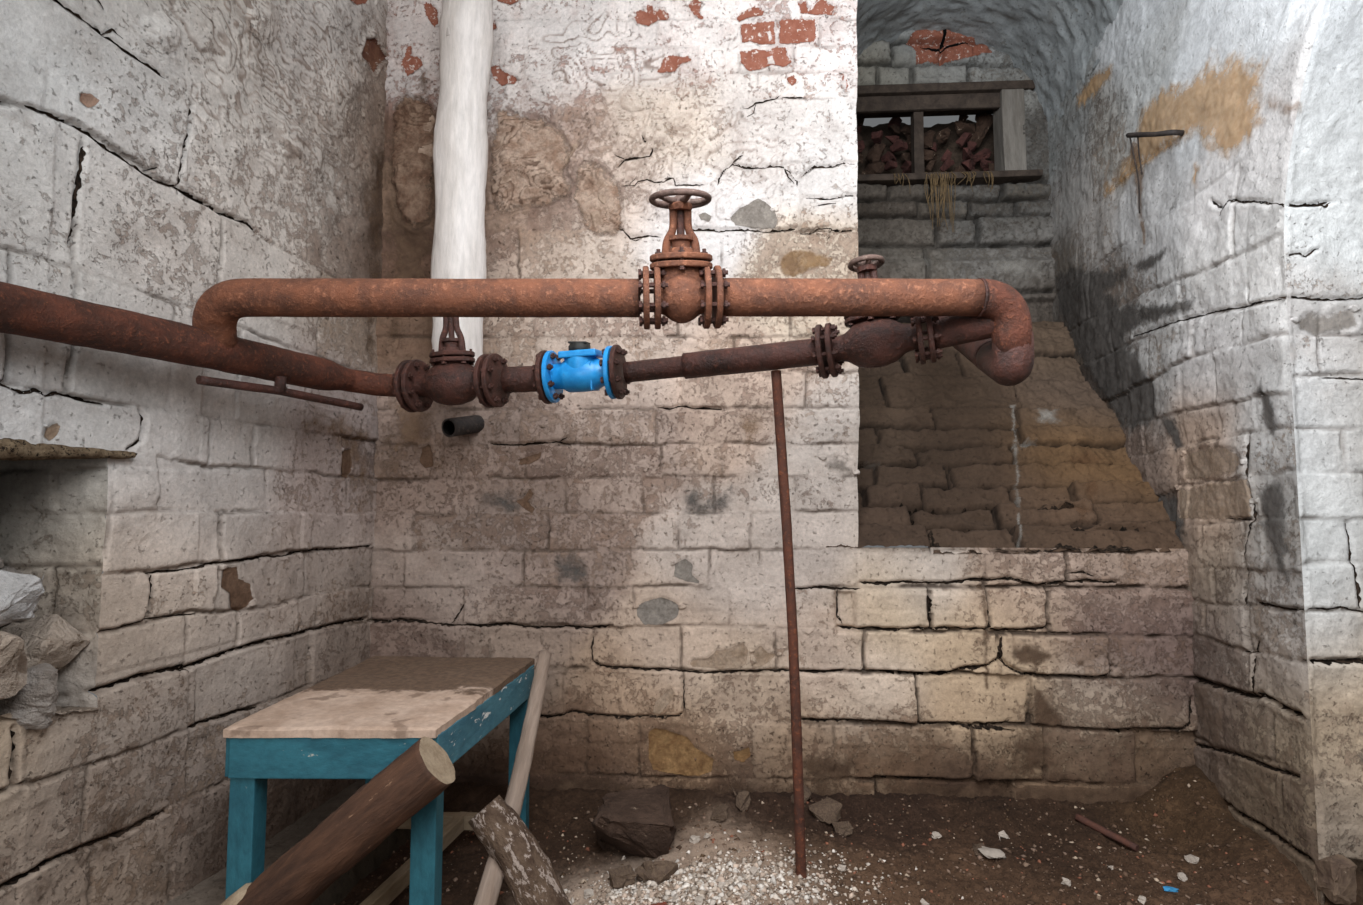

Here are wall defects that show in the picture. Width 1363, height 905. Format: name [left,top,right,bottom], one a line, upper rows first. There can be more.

spalling [628,5,670,26]
spalling [650,54,691,73]
spalling [730,0,835,85]
crack [0,101,253,244]
crack [617,136,854,238]
rust [1104,60,1257,243]
crack [1212,199,1331,215]
water stain [1137,249,1166,269]
water stain [1131,302,1192,322]
water stain [1163,419,1183,451]
crack [1226,434,1363,612]
peeling [217,563,258,611]